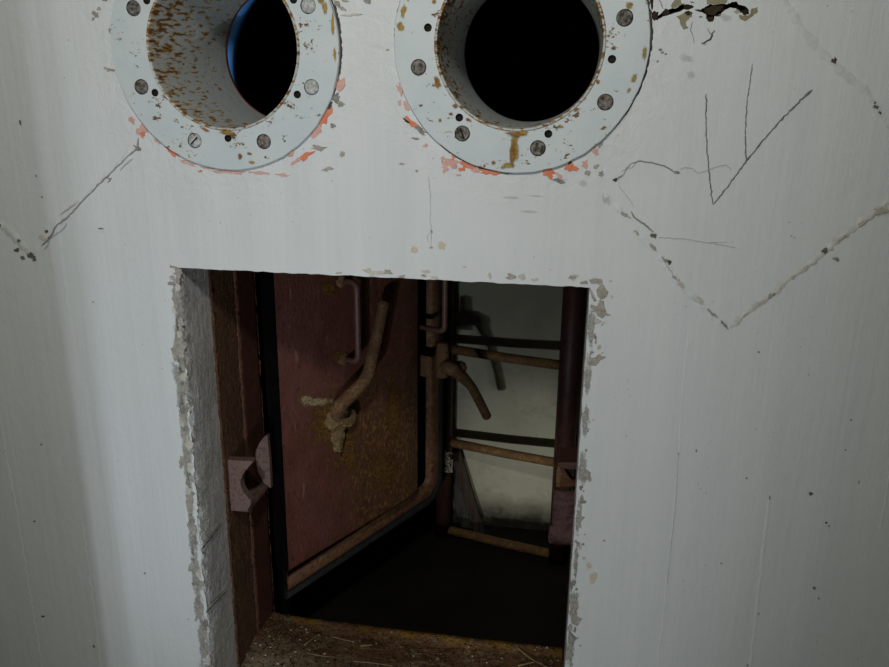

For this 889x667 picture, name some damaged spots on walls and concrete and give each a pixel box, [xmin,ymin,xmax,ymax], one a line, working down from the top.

crack [618,0,653,124]
spalling [650,0,758,45]
crack [39,138,141,250]
peeling [128,78,346,177]
peeling [396,82,428,147]
peeling [441,154,511,176]
rust [492,131,528,169]
peeling [542,142,604,184]
crack [613,160,732,206]
spalling [569,274,613,393]
spalling [168,265,213,667]
spalling [565,449,592,667]